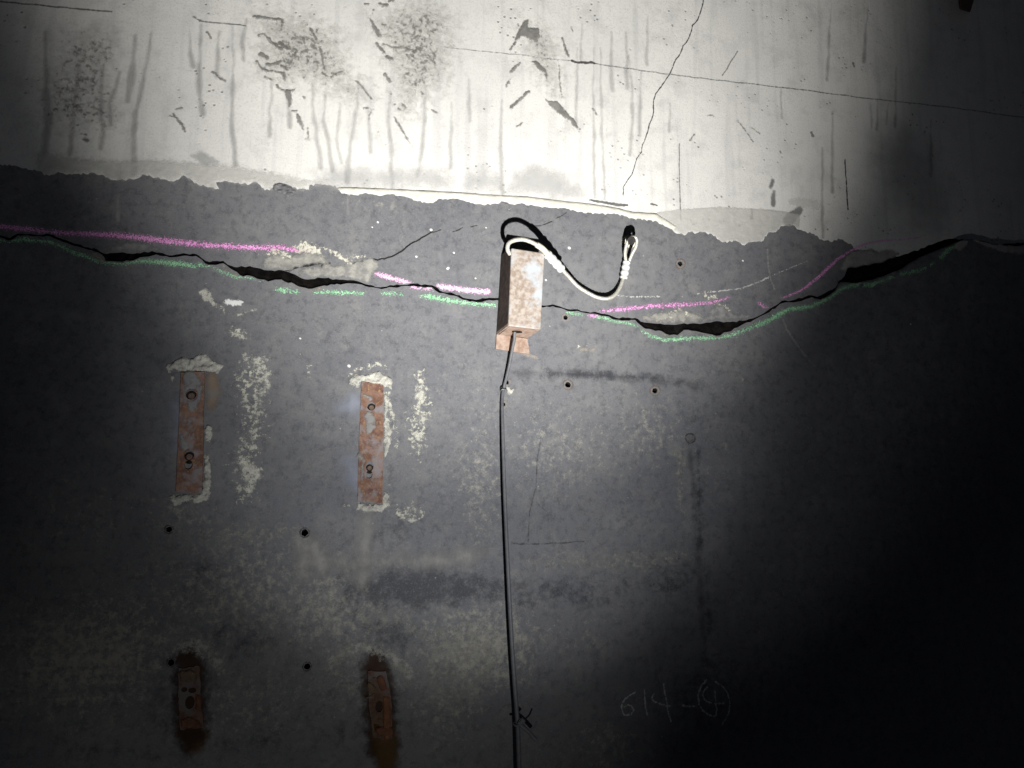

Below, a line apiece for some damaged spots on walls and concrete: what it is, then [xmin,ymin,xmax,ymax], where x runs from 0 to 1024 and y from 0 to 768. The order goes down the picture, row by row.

crack [623,0,704,194]
crack [0,225,498,302]
peeling [273,183,296,198]
peeling [338,187,799,243]
crack [542,239,963,336]
corrosion [363,394,376,434]
corrosion [174,647,205,751]
corrosion [361,649,397,768]